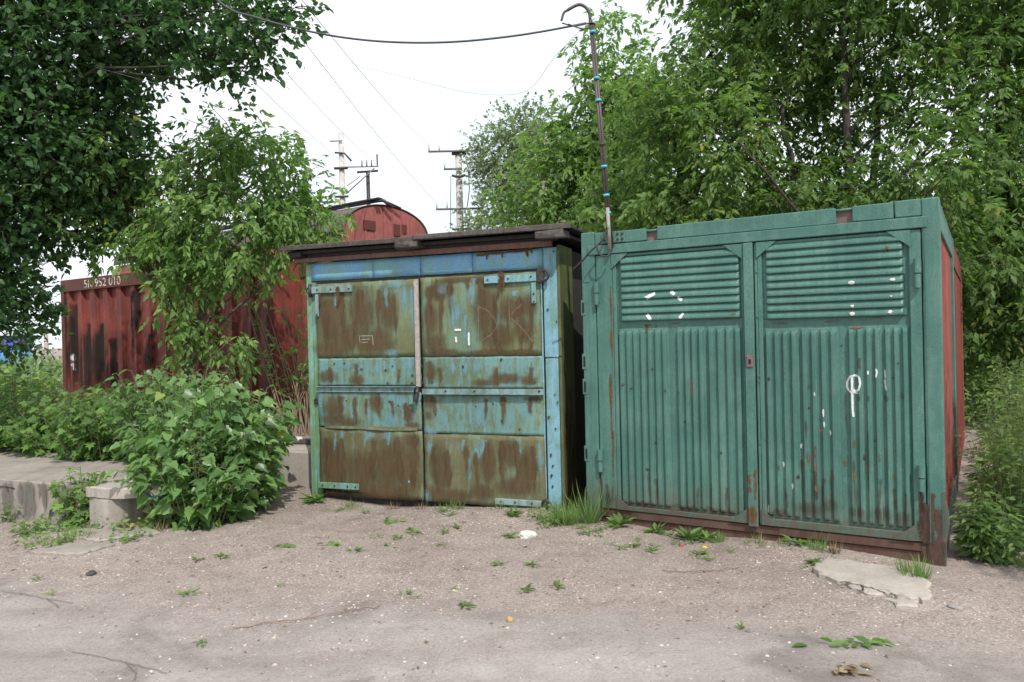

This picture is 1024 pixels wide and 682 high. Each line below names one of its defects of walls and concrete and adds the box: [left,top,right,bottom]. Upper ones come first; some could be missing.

leakage [65,297,117,370]
leakage [130,290,141,329]
corrosion [316,287,397,381]
corrosion [425,271,537,385]
corrosion [322,363,537,502]
corrosion [919,494,947,566]